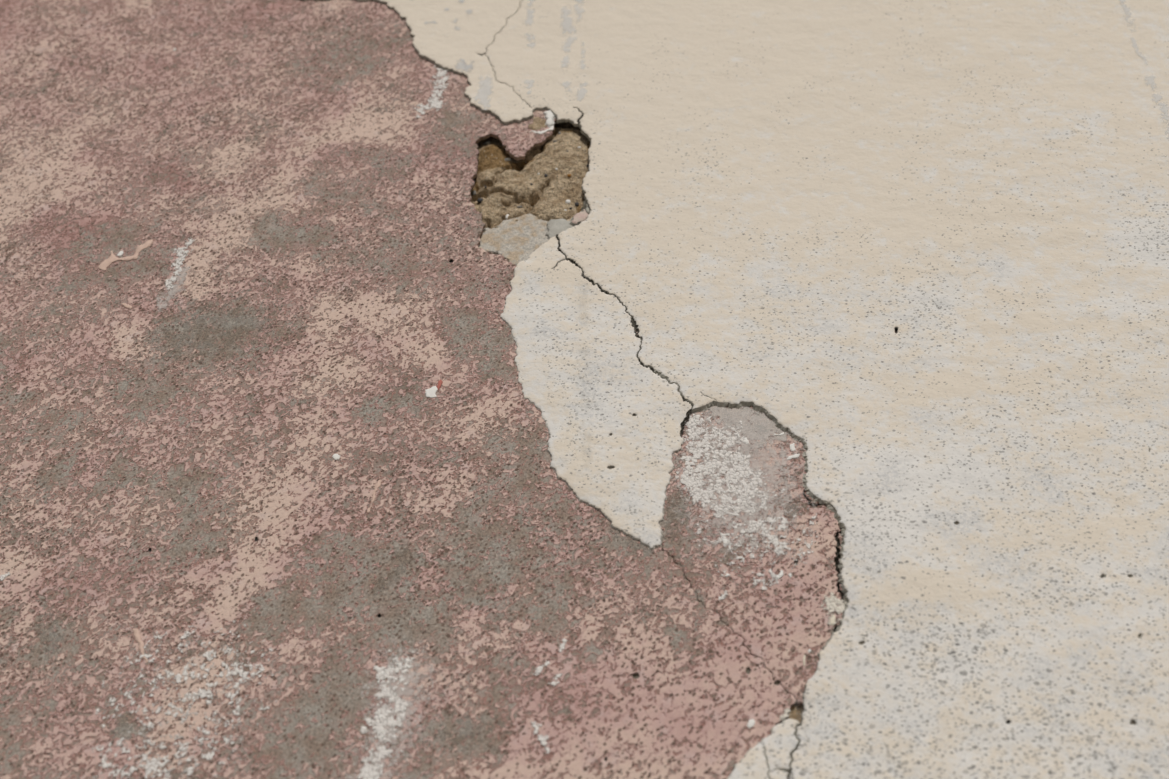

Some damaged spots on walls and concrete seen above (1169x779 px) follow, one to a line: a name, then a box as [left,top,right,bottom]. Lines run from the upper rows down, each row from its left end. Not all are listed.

flaking render [0,0,848,779]
crack [556,234,693,435]
water stain [673,407,801,555]